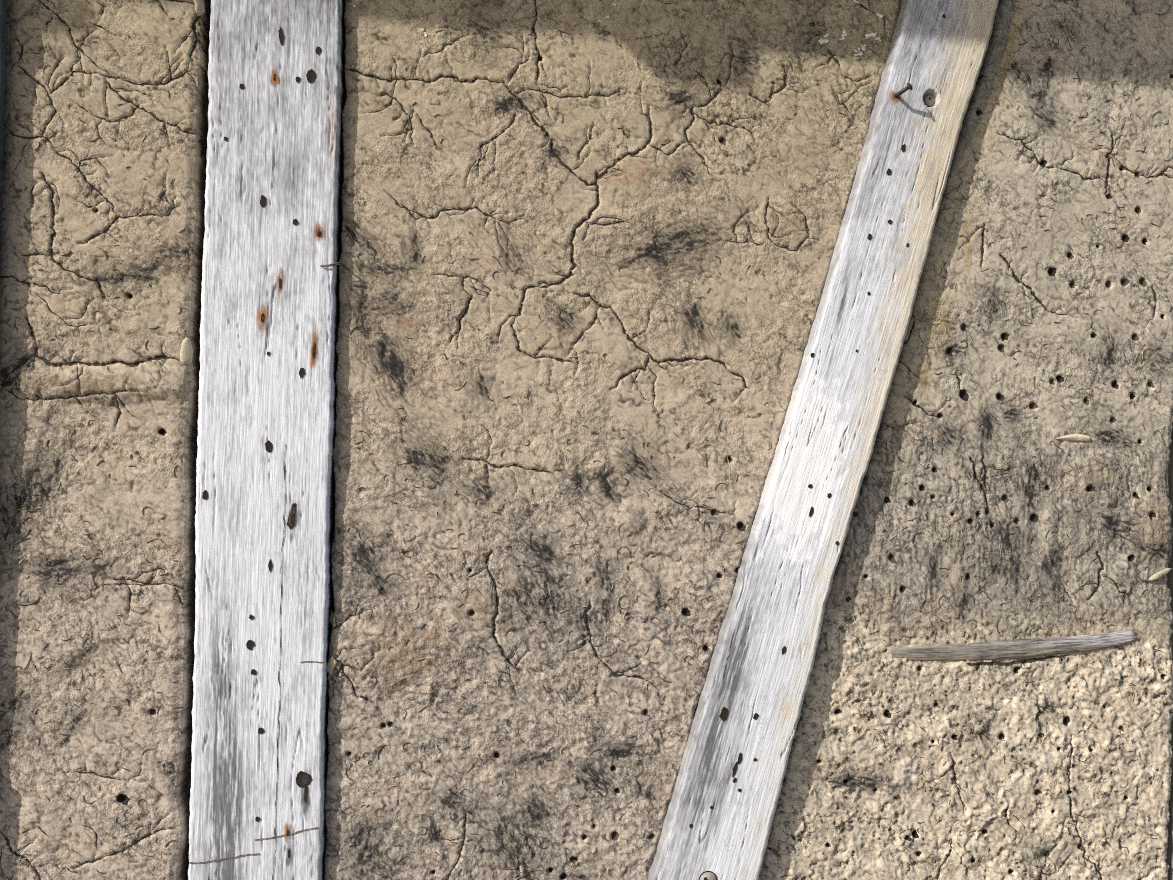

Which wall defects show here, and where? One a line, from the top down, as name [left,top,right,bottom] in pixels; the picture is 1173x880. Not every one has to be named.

crack [819,49,869,111]
crack [998,128,1173,196]
crack [0,0,207,429]
crack [347,0,802,416]
crack [716,198,818,251]
crack [963,224,1071,316]
corrosion [257,309,267,329]
corrosion [310,333,318,366]
crack [463,426,569,493]
crack [663,493,736,535]
crack [470,552,528,693]
crack [566,602,660,691]